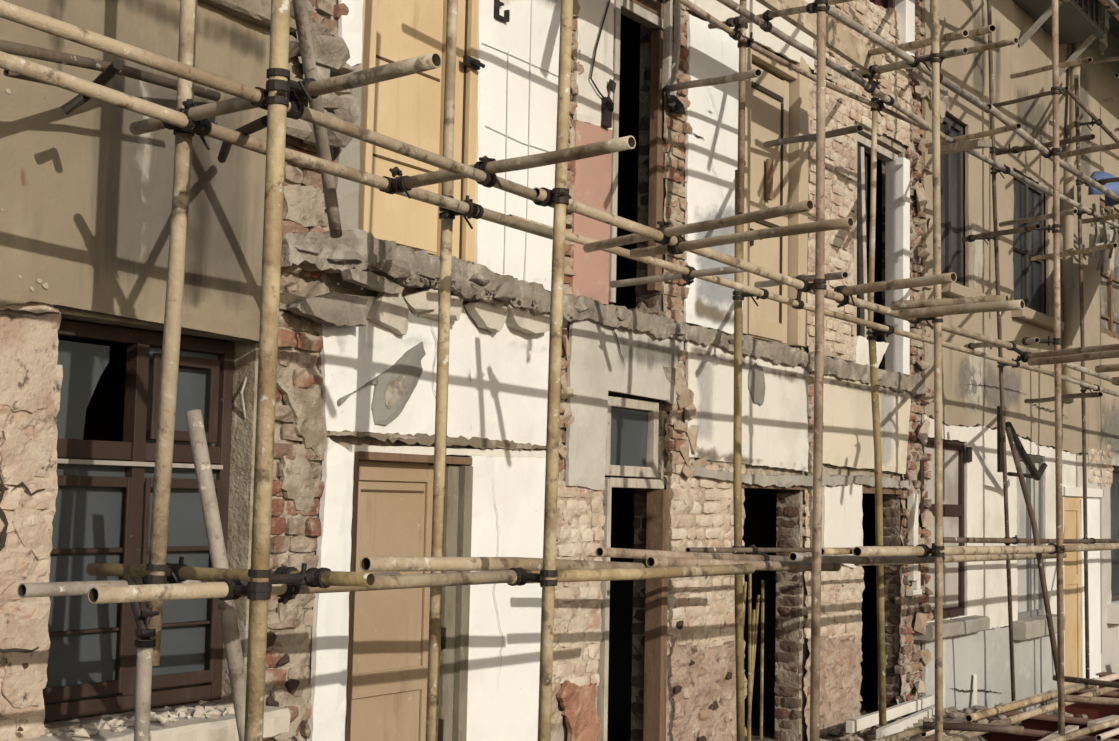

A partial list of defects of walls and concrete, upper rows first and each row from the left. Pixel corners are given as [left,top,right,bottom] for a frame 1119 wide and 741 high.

spalling [288,0,356,82]
spalling [282,89,361,234]
spalling [807,0,950,361]
crack [0,476,46,551]
spalling [0,274,63,741]
spalling [269,265,329,571]
spalling [390,271,605,561]
spalling [662,341,746,554]
spalling [263,593,316,741]
spalling [551,581,603,741]
spalling [666,574,747,741]
spalling [895,563,933,714]